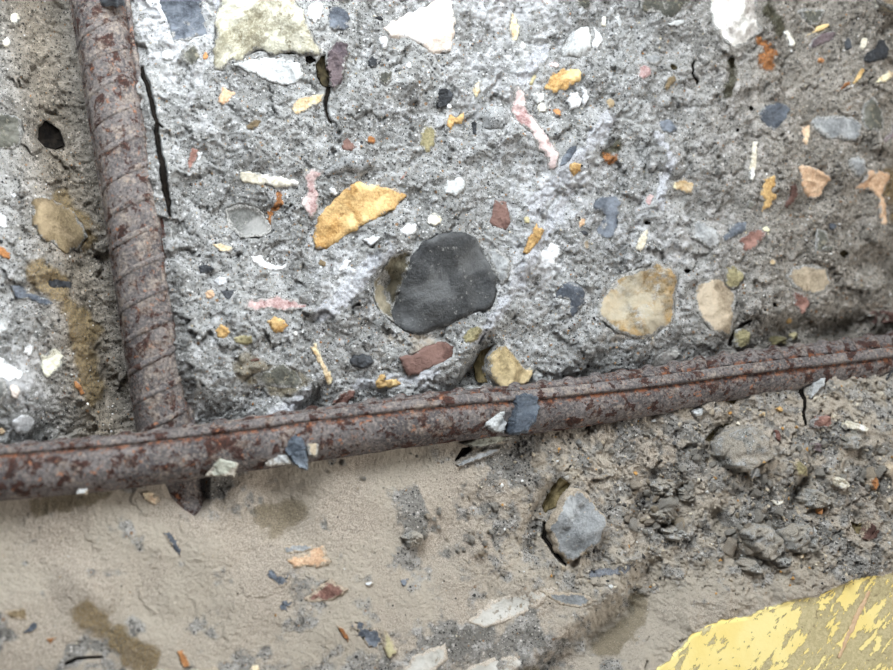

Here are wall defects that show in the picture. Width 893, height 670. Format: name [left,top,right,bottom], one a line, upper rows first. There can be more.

corrosion [54,189,97,248]
spalling [0,0,196,444]
crack [141,66,171,217]
crack [324,86,332,123]
spalling [130,0,893,425]
corrosion [27,259,104,406]
spalling [0,331,893,670]